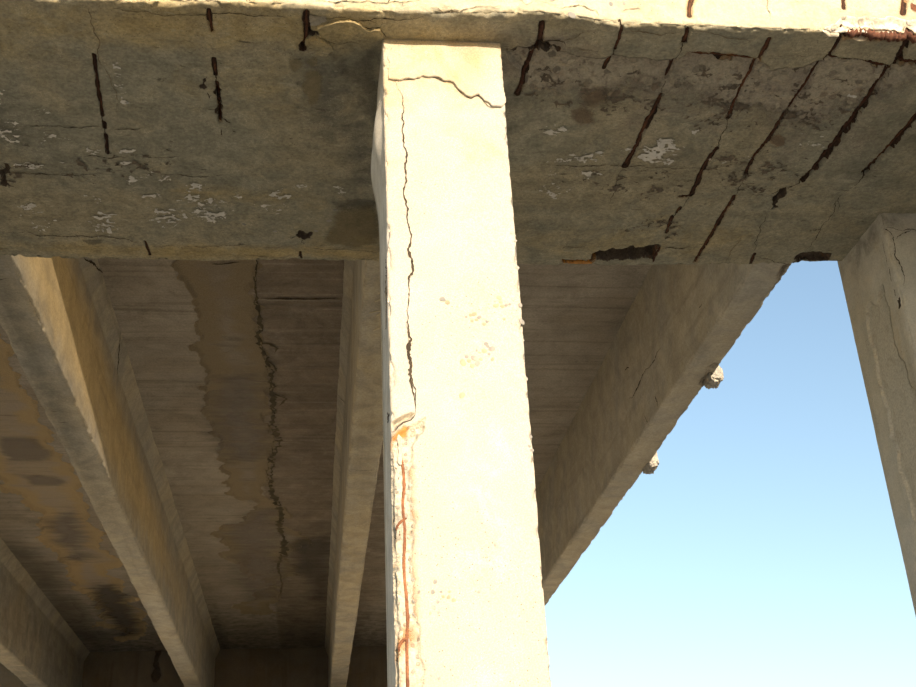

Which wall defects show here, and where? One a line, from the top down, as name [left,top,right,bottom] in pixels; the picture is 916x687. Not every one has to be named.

peeling [298,9,383,57]
spalling [387,0,916,262]
efflorescence [84,195,117,236]
leakage [149,183,234,228]
crack [10,232,136,273]
crack [375,77,498,412]
spalling [768,251,831,295]
crack [163,242,372,601]
spalling [387,412,426,687]